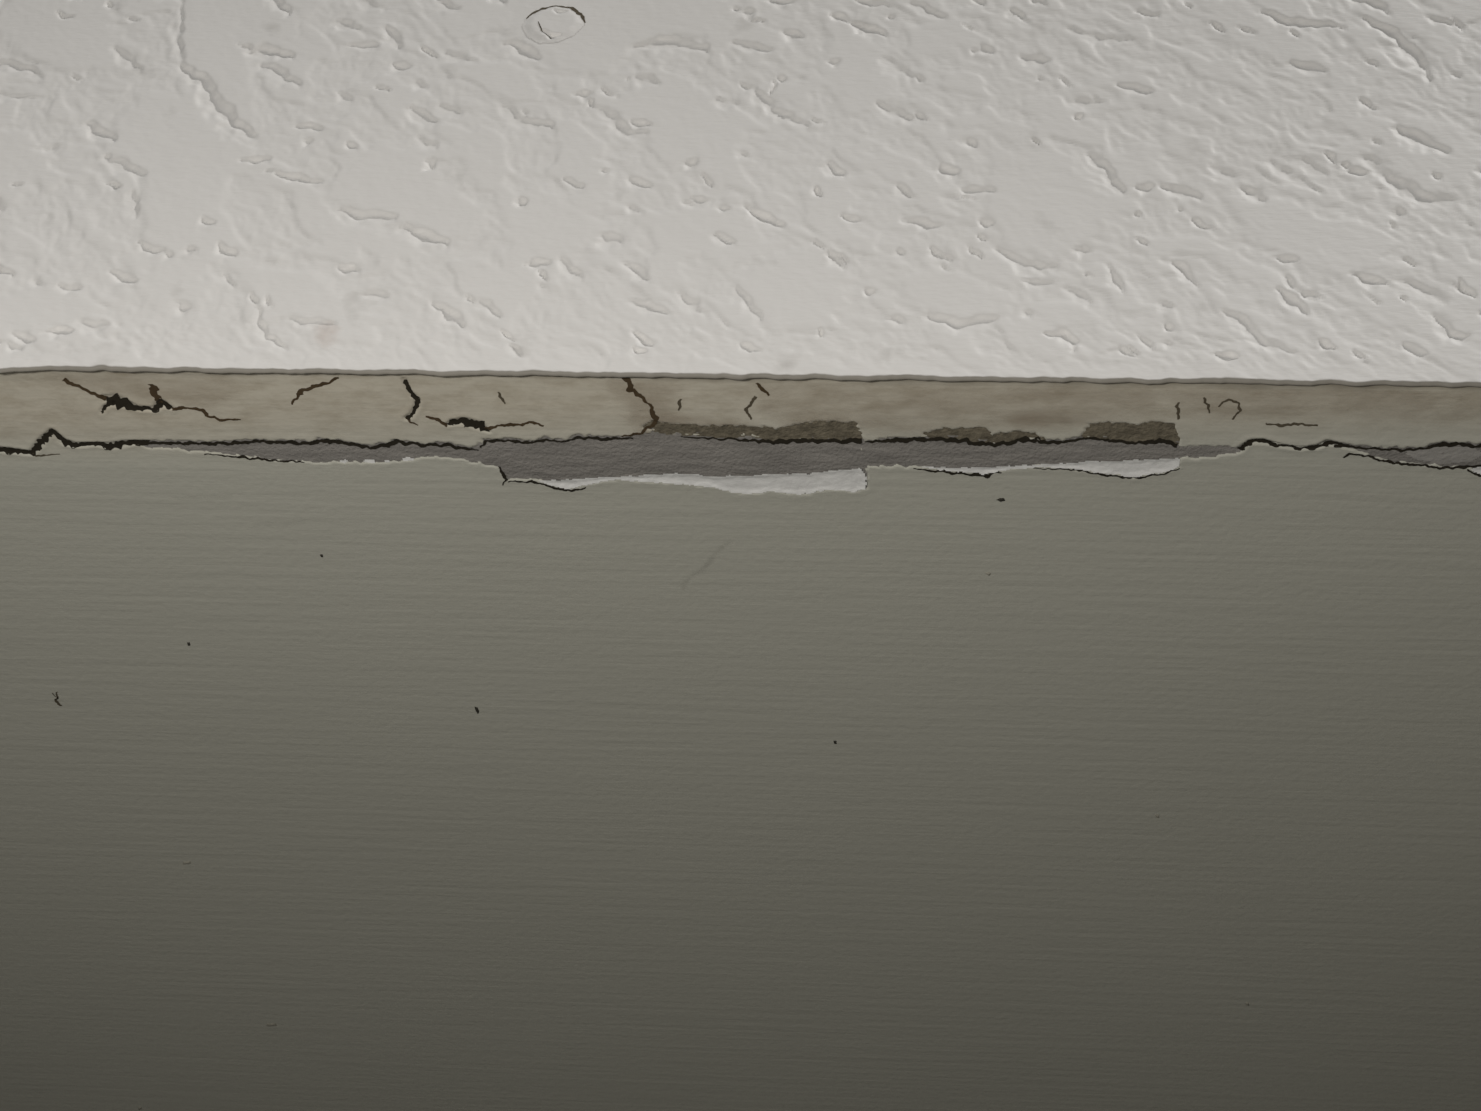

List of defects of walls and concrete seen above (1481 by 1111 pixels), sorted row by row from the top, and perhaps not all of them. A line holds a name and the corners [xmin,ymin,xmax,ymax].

crack [0,378,241,457]
crack [291,377,339,405]
crack [403,379,544,432]
crack [621,377,682,437]
crack [744,383,769,420]
crack [1175,397,1352,451]
peeling [135,420,1243,495]
peeling [1334,441,1481,477]